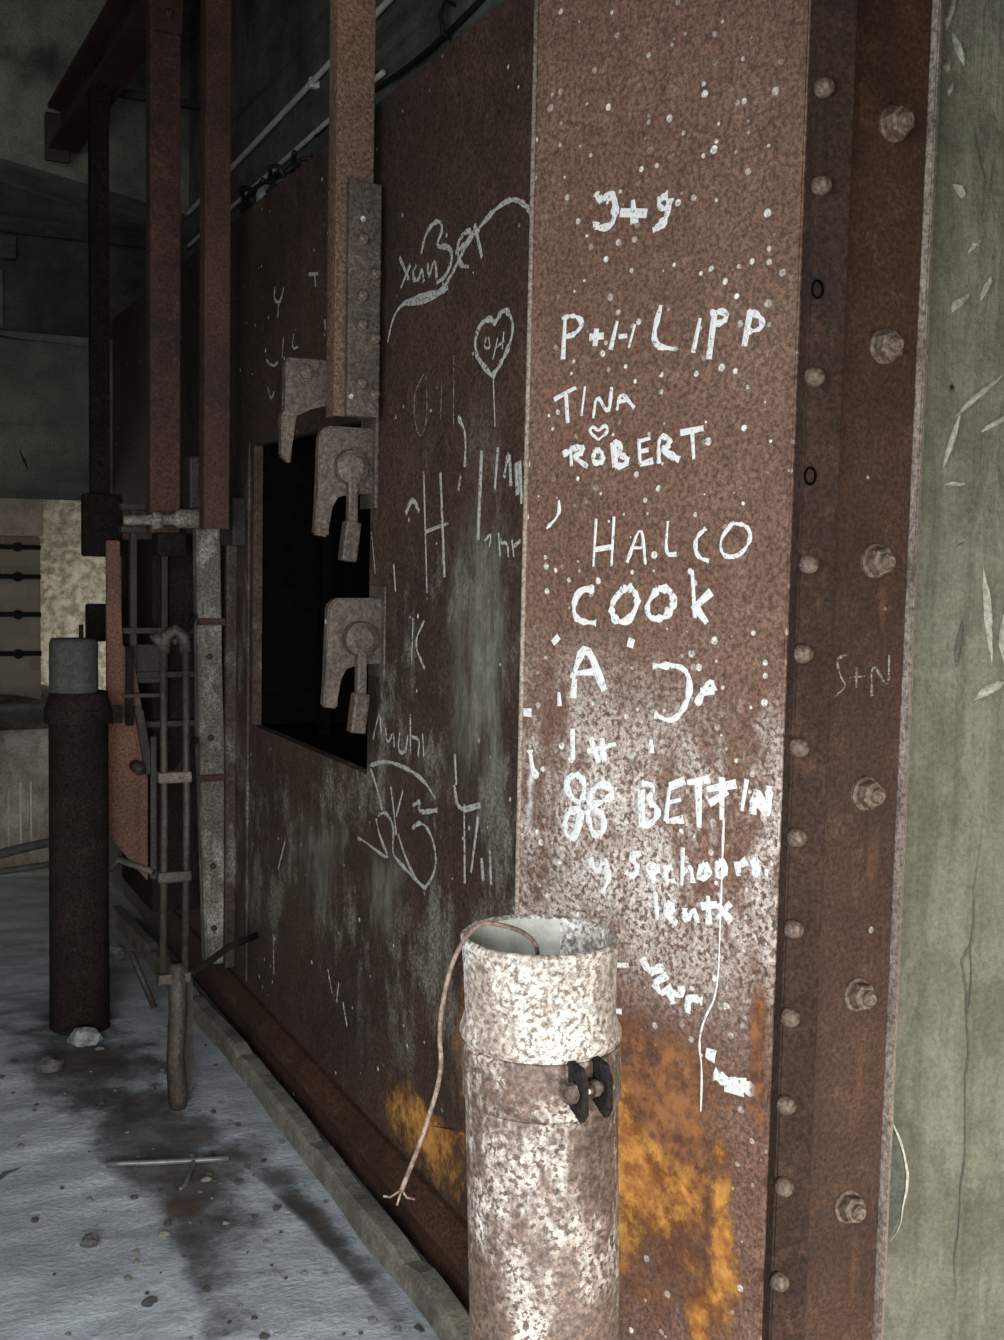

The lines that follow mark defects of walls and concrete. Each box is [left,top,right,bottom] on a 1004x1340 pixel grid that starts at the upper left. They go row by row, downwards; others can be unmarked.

rust [751,991,766,1120]
crack [0,1167,21,1180]
rust [388,1091,464,1181]
rust [616,1013,736,1340]